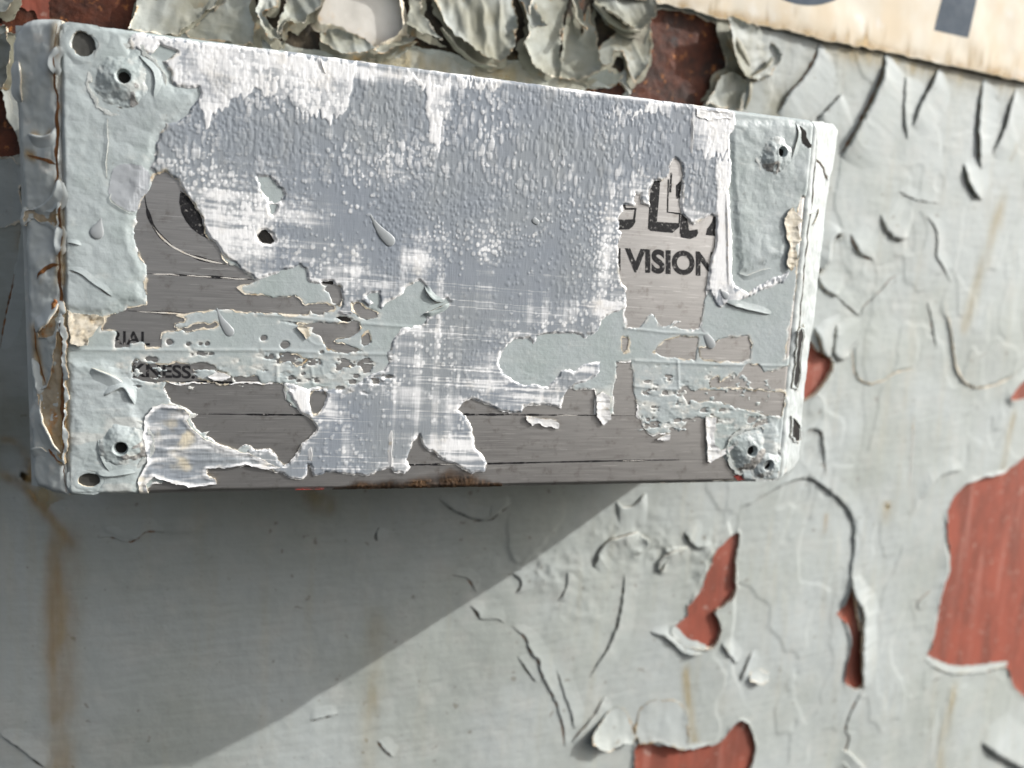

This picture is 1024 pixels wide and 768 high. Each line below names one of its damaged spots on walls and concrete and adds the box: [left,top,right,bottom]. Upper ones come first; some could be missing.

peeling [0,0,782,231]
crack [963,78,1024,201]
crack [777,43,954,389]
peeling [101,157,806,492]
peeling [804,340,835,401]
crack [452,567,638,747]
peeling [654,545,686,576]
peeling [667,528,742,652]
peeling [836,579,866,694]
peeling [923,456,1024,701]
peeling [592,699,760,768]